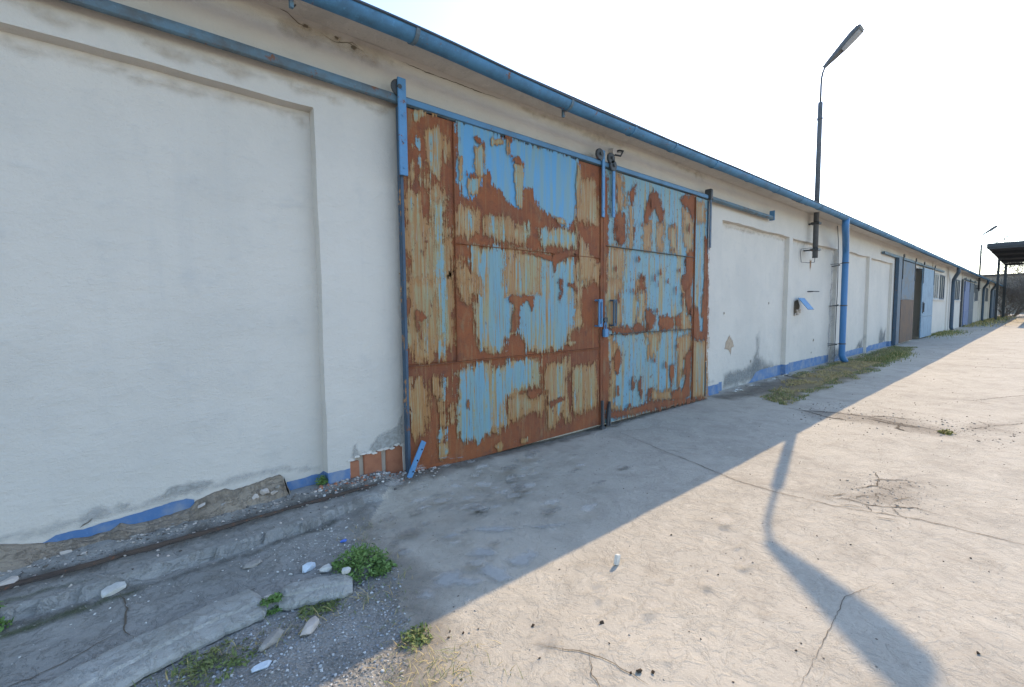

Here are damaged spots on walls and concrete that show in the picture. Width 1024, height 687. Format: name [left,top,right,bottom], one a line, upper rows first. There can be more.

corrosion [415,309,427,340]
peeling [348,109,600,486]
corrosion [509,294,535,333]
corrosion [518,249,578,299]
corrosion [596,171,710,421]
crack [604,429,1024,545]
crack [801,583,878,685]